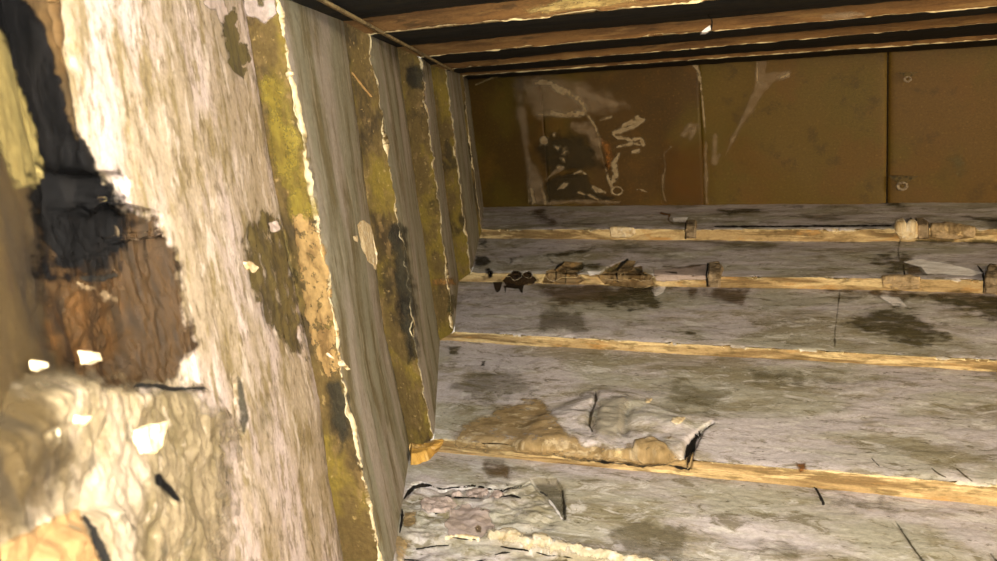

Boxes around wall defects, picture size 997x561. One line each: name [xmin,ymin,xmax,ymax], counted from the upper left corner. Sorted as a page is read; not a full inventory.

damp [515,77,645,226]
spalling [0,30,199,391]
damp [869,290,997,305]
crack [135,383,205,391]
spalling [454,398,654,465]
spalling [403,488,504,542]
crack [399,483,571,561]
spalling [533,478,566,520]
crack [897,524,924,561]